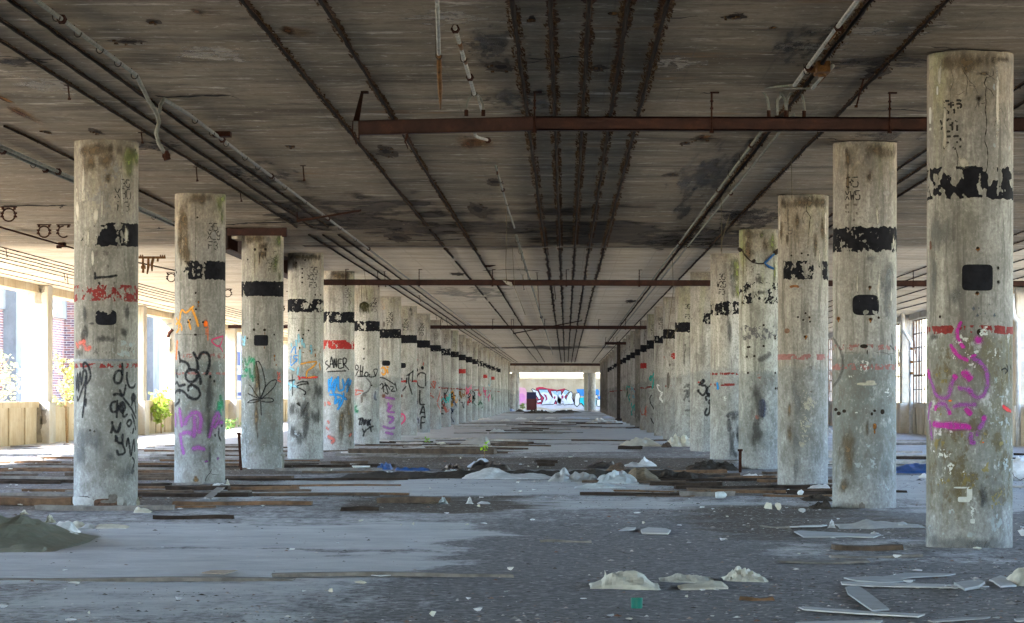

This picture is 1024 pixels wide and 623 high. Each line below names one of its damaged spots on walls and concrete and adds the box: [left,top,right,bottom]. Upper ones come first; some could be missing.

rust [239,1,359,135]
crack [932,47,1007,172]
water stain [87,196,103,265]
water stain [76,141,179,220]
water stain [243,140,833,280]
rust [524,131,639,251]
water stain [339,386,353,445]